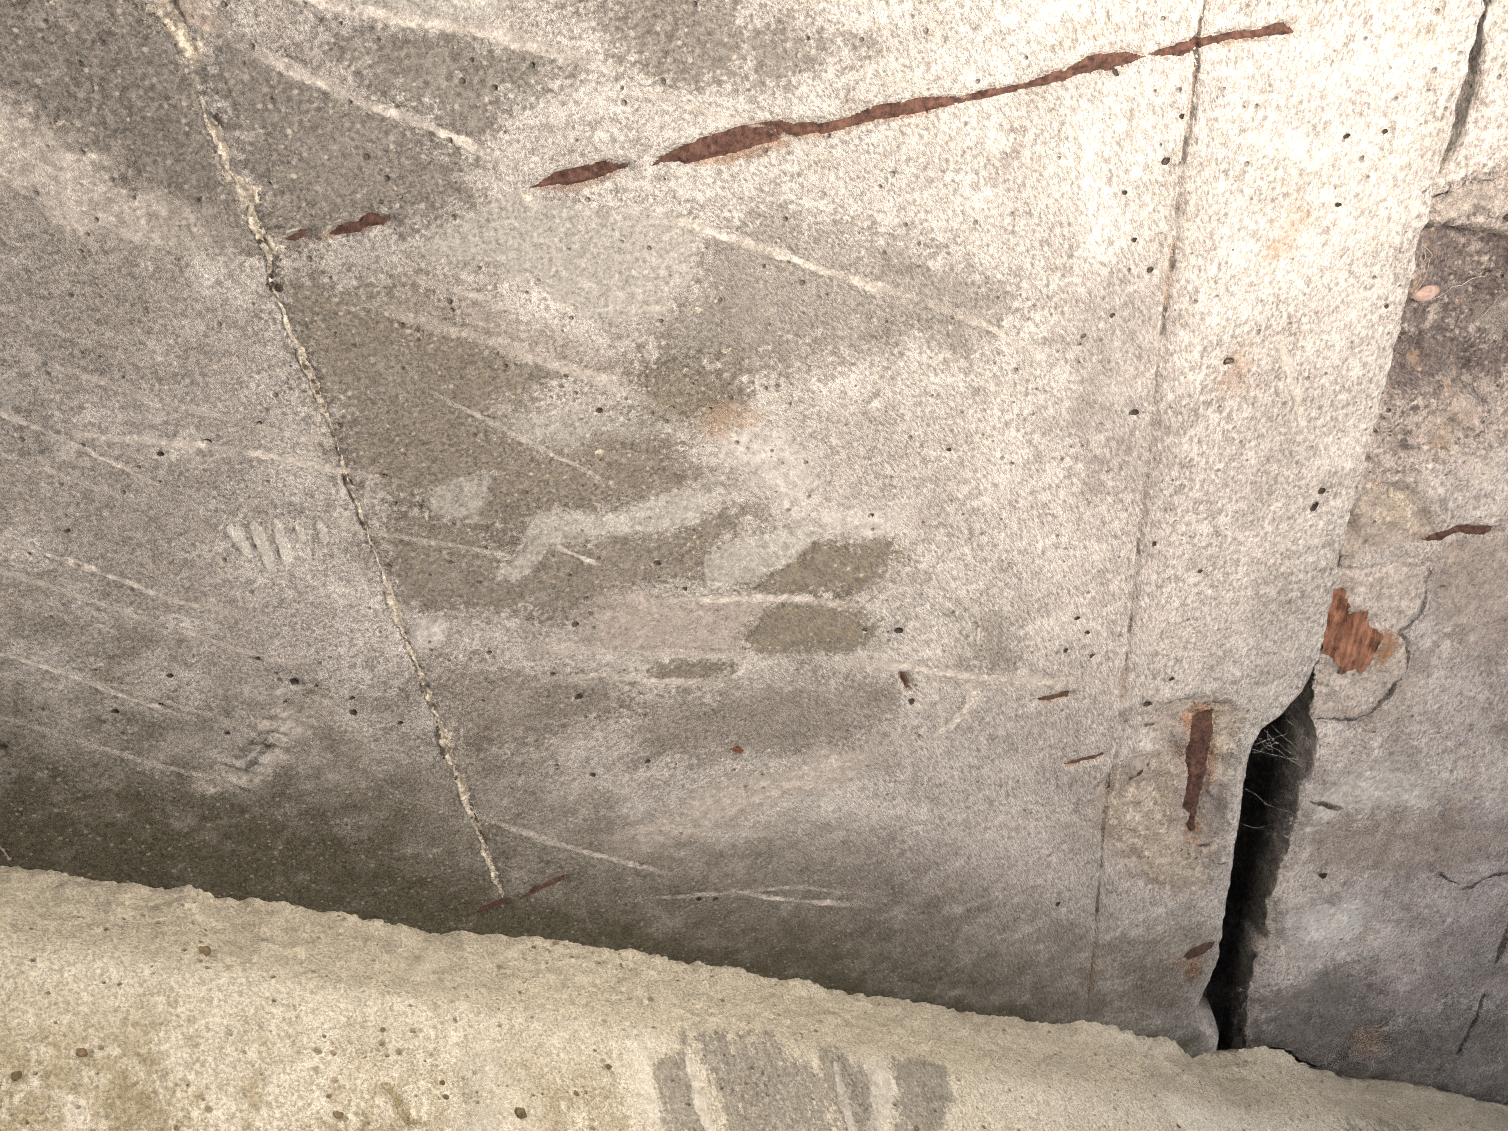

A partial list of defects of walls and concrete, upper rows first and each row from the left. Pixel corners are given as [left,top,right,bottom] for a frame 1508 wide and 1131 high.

crack [143,0,504,897]
crack [1440,872,1508,891]
crack [1458,929,1508,1053]